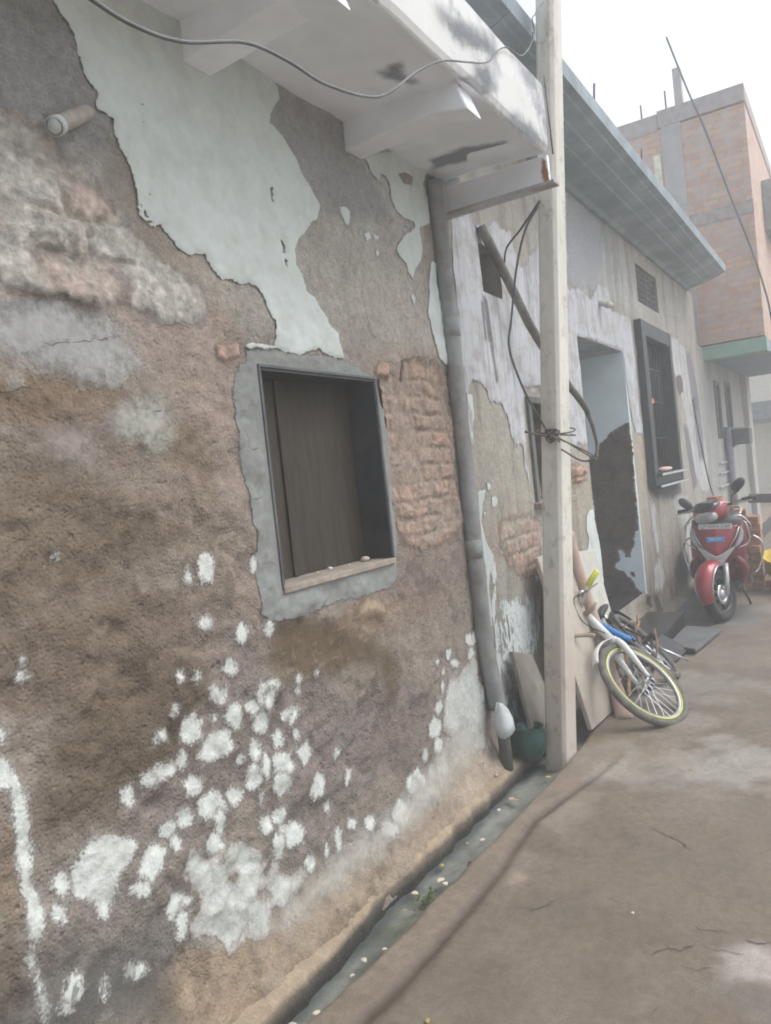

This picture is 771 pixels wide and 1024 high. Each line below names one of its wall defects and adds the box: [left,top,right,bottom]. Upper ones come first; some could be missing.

peeling [0,0,344,360]
peeling [340,207,350,225]
spalling [364,151,464,553]
peeling [451,214,541,485]